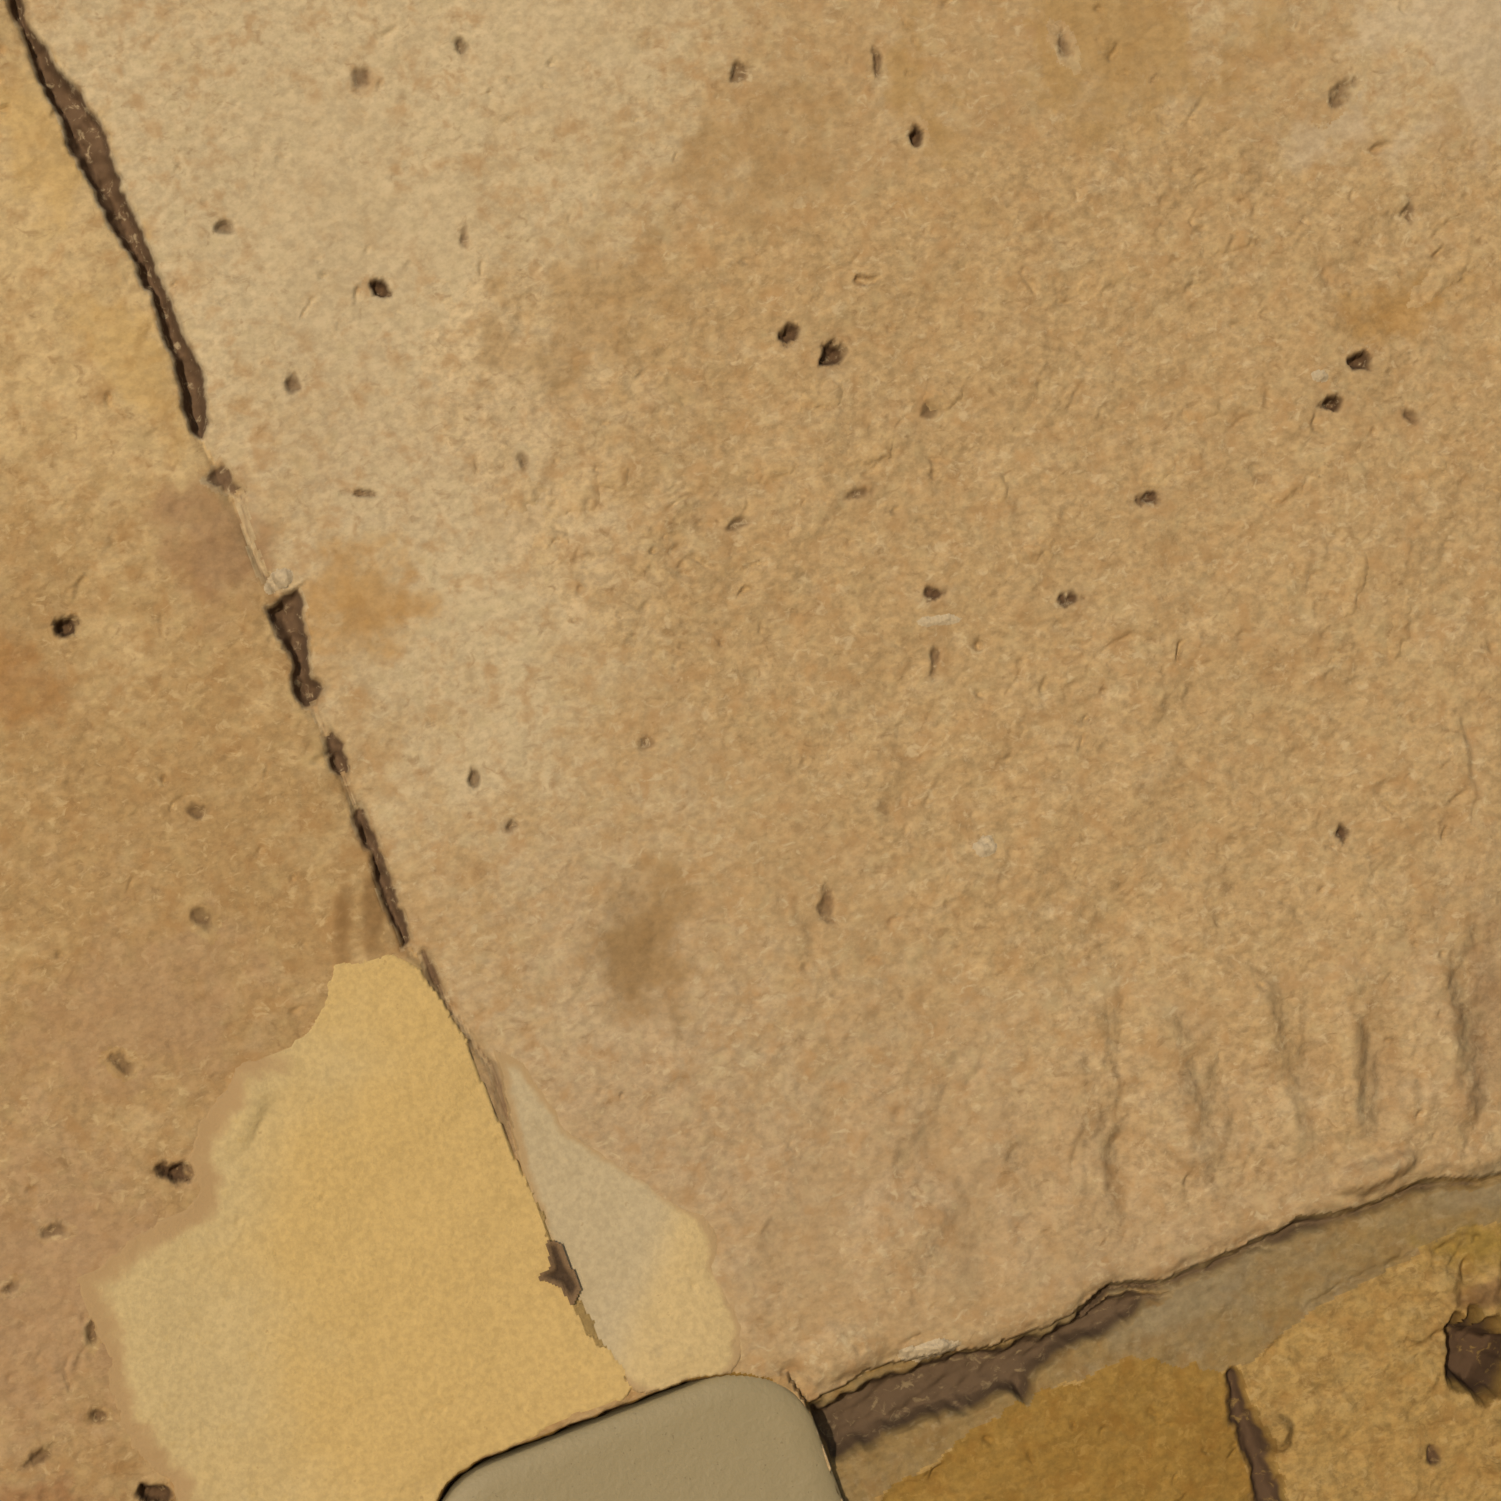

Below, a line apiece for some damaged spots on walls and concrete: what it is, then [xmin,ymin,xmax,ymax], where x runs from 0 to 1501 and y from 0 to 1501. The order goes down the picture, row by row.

crack [5,0,521,1167]
crack [807,1173,1501,1464]